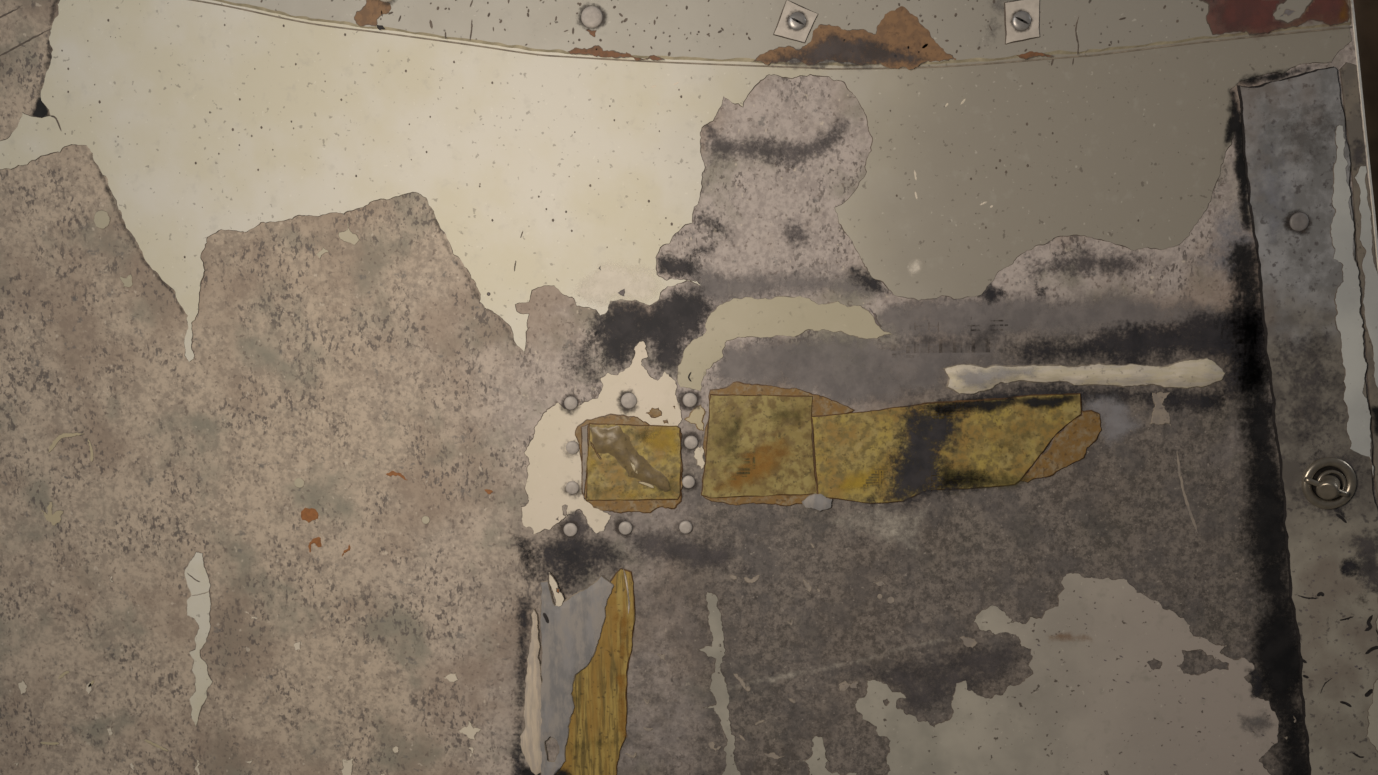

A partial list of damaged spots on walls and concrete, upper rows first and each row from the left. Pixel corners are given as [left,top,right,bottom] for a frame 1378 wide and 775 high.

corrosion [1199,0,1350,35]
peeling [0,0,1351,362]
damp [1225,67,1309,229]
peeling [521,296,892,535]
peeling [185,552,213,726]
peeling [699,592,751,775]
peeling [803,736,857,775]
peeling [839,573,1296,775]
damp [1250,670,1262,697]